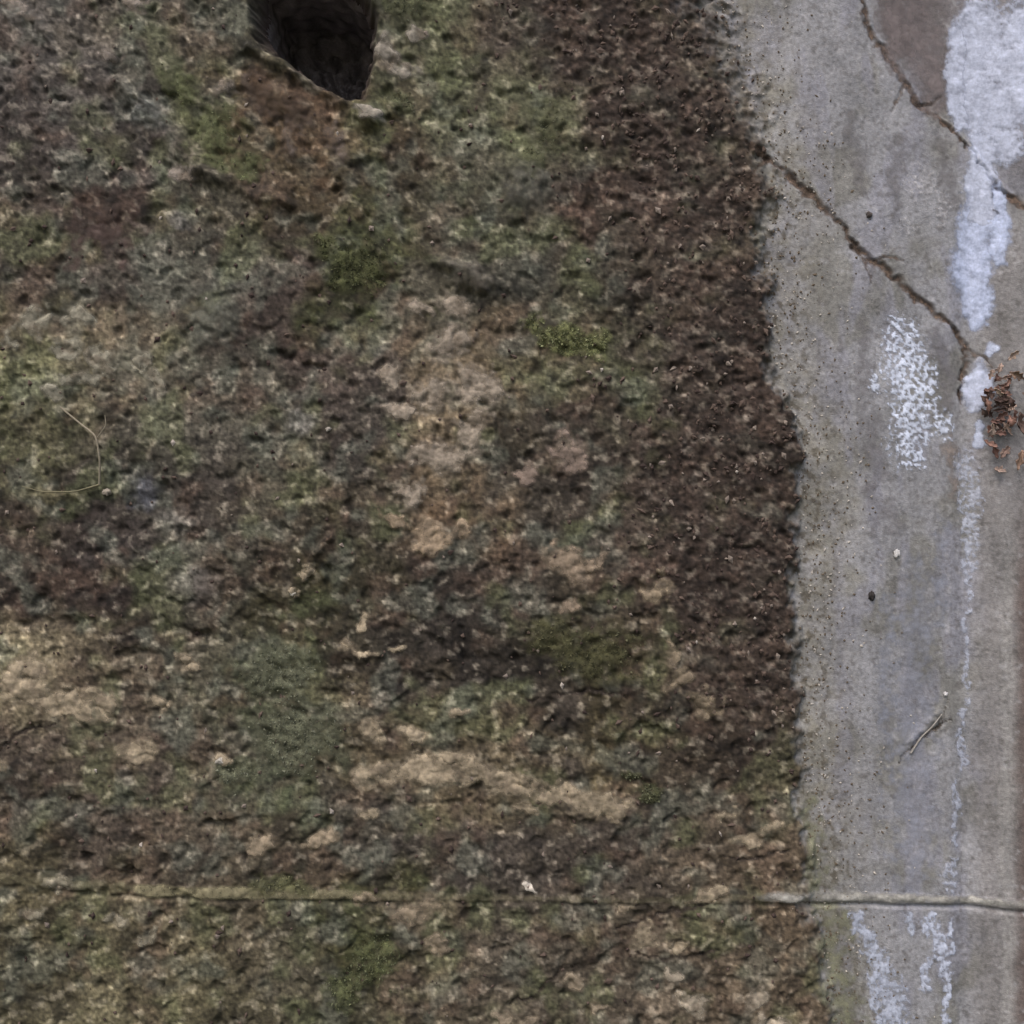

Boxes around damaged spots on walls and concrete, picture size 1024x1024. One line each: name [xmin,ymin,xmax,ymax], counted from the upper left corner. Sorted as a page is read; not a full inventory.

crack [860,0,969,149]
crack [743,140,993,403]
damp [882,0,1024,331]
crack [992,180,1024,212]
damp [868,315,954,470]
damp [840,910,956,1024]